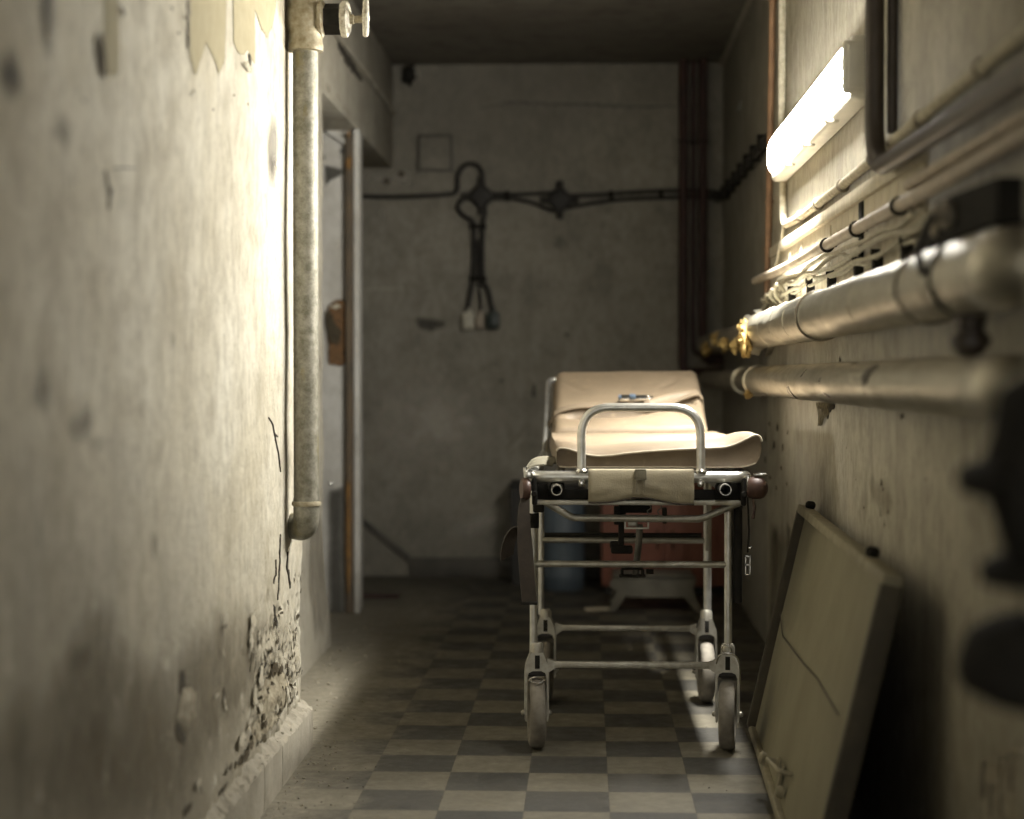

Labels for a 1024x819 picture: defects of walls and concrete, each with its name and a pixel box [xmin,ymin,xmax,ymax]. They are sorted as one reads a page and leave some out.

peeling [178,0,276,74]
crack [268,417,281,472]
peeling [816,402,836,426]
crack [273,534,291,628]
flaking render [222,600,303,792]